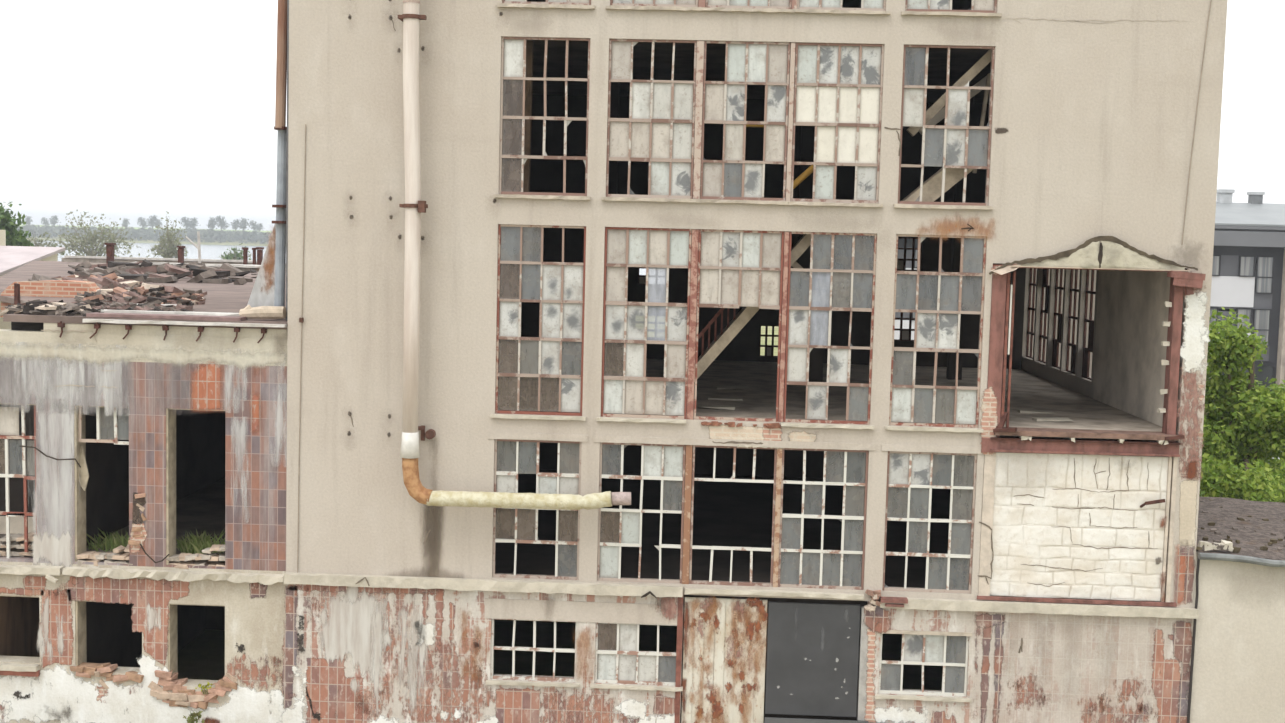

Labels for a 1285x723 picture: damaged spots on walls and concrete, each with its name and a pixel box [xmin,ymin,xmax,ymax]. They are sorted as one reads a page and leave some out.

crack [1008,17,1180,25]
corrosion [936,221,990,235]
peeling [191,362,221,410]
spalling [980,387,998,455]
peeling [1155,291,1210,604]
crack [978,458,1158,587]
peeling [0,492,675,723]
corrosion [657,597,768,723]
spalling [847,589,956,723]
peeling [976,613,1005,629]
peeling [1010,675,1045,709]
peeling [1079,621,1192,723]